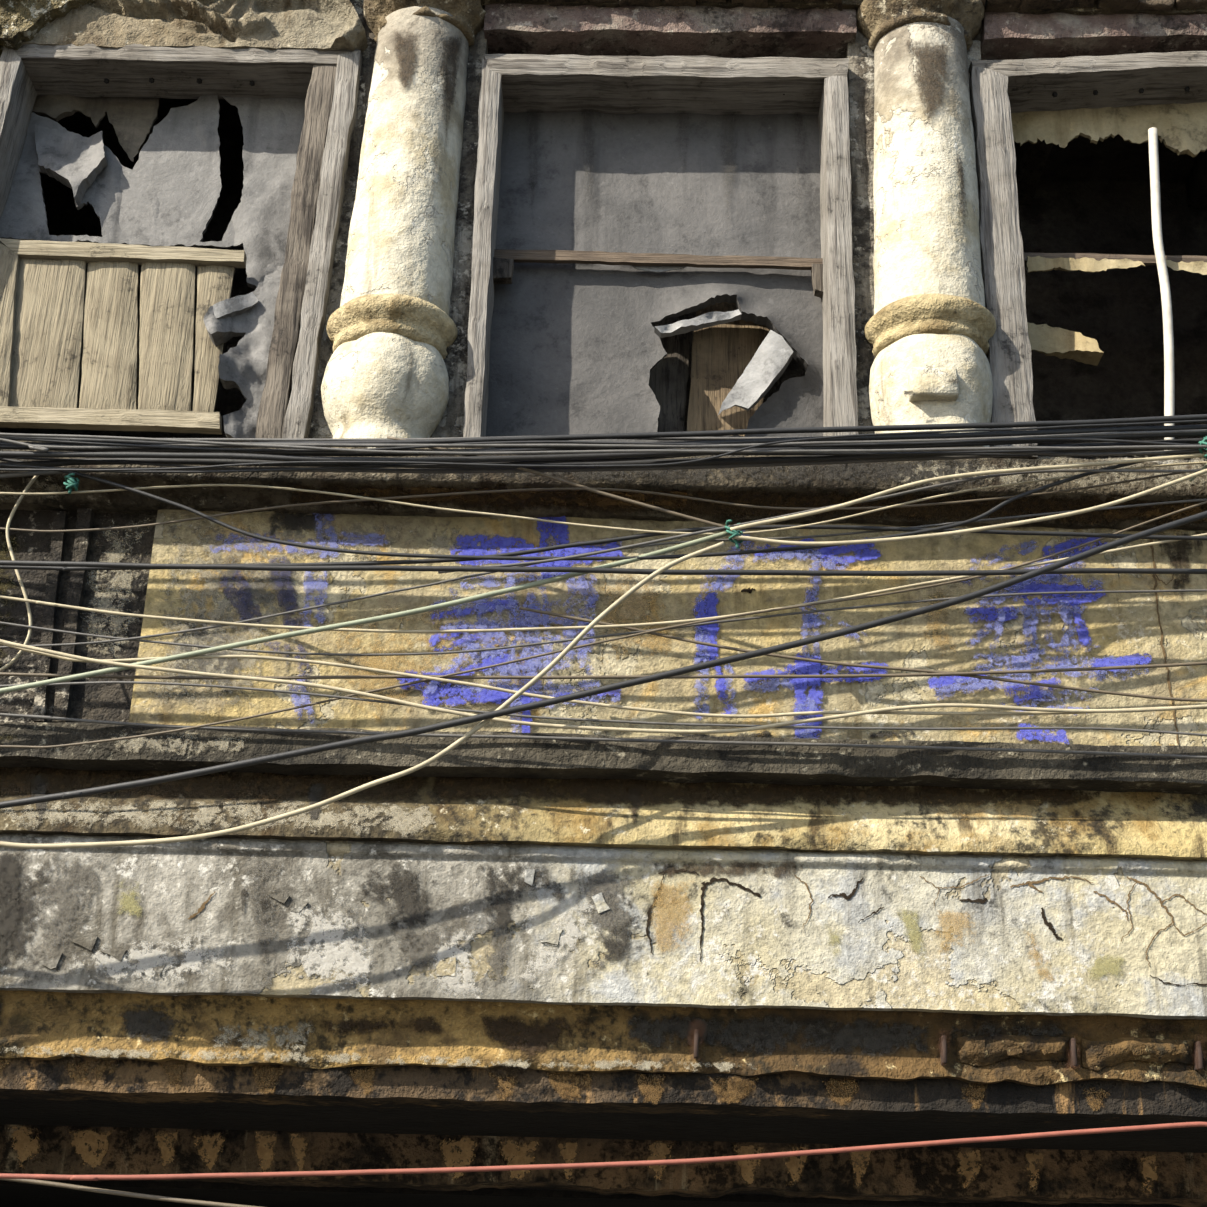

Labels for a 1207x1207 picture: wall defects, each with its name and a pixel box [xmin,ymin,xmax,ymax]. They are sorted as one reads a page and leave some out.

leakage [394,32,418,87]
leakage [440,37,461,116]
leakage [907,40,947,120]
leakage [0,852,106,978]
leakage [361,869,459,972]
crack [646,868,761,962]
crack [920,874,1207,986]